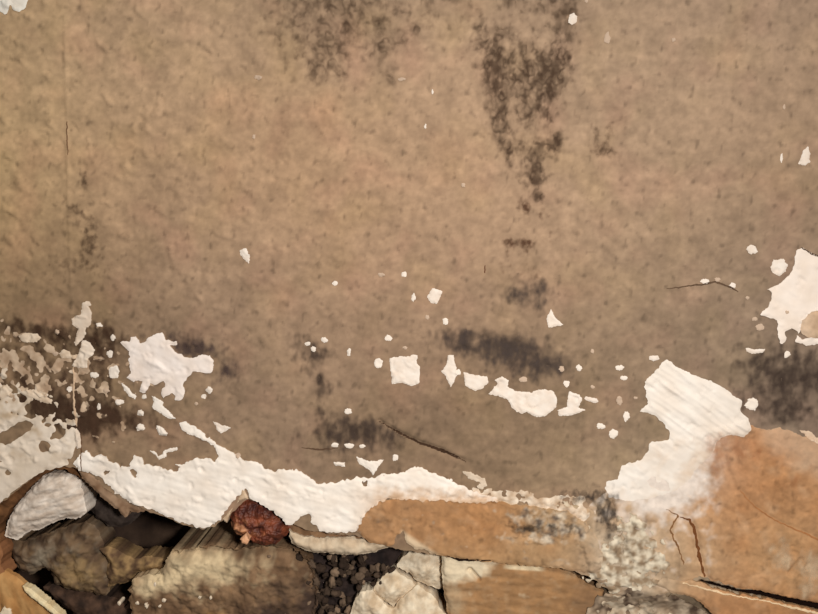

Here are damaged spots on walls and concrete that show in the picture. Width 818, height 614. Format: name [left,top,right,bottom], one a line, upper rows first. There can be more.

leakage [538,55,570,108]
peeling [798,147,810,165]
peeling [760,248,818,346]
leakage [444,329,473,351]
leakage [478,337,562,378]
peeling [0,301,499,533]
leakage [315,418,394,450]
crack [666,509,818,609]